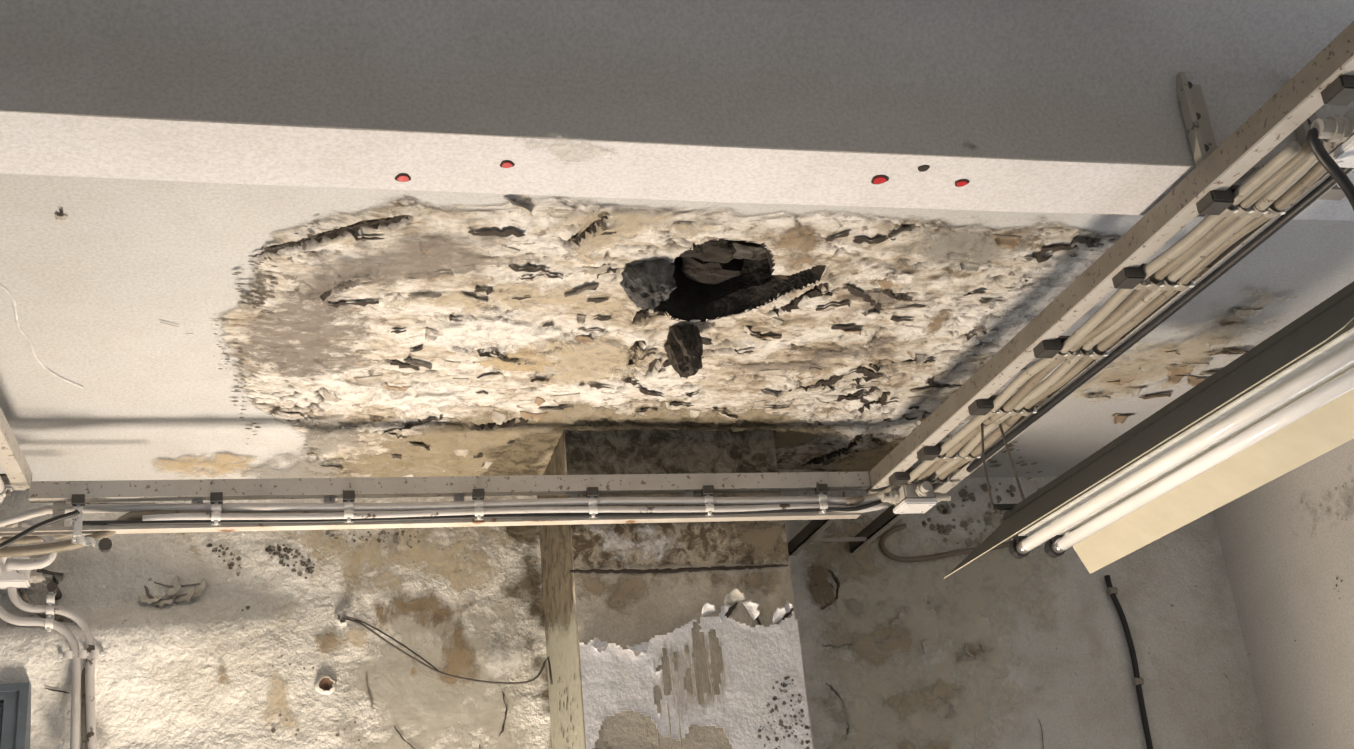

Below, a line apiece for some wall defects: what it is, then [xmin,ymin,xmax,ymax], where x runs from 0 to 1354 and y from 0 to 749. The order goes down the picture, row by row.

flaking render [215,196,1122,478]
water stain [191,543,242,576]
water stain [537,495,586,507]
flaking render [571,505,789,569]
water stain [676,521,788,595]
flaking render [809,565,840,610]
water stain [804,441,1060,749]
water stain [265,524,671,749]
peeling [579,587,813,749]
water stain [756,676,810,749]